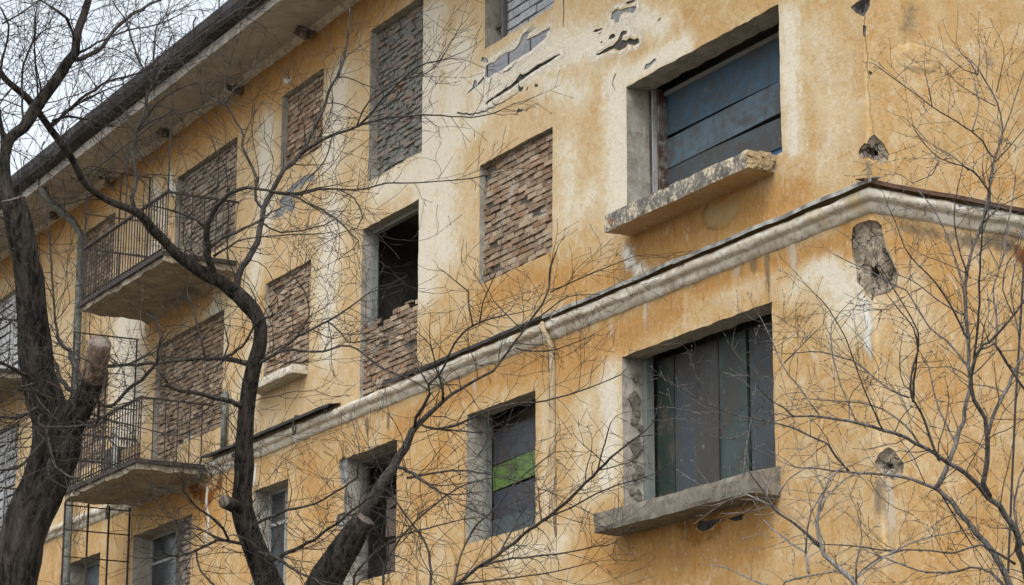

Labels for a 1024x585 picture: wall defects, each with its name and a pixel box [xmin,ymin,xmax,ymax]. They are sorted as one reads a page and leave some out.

flaking render [471,22,553,91]
flaking render [591,0,644,62]
flaking render [851,0,870,37]
flaking render [859,135,888,164]
flaking render [852,221,899,301]
flaking render [627,374,643,501]
flaking render [875,447,904,480]